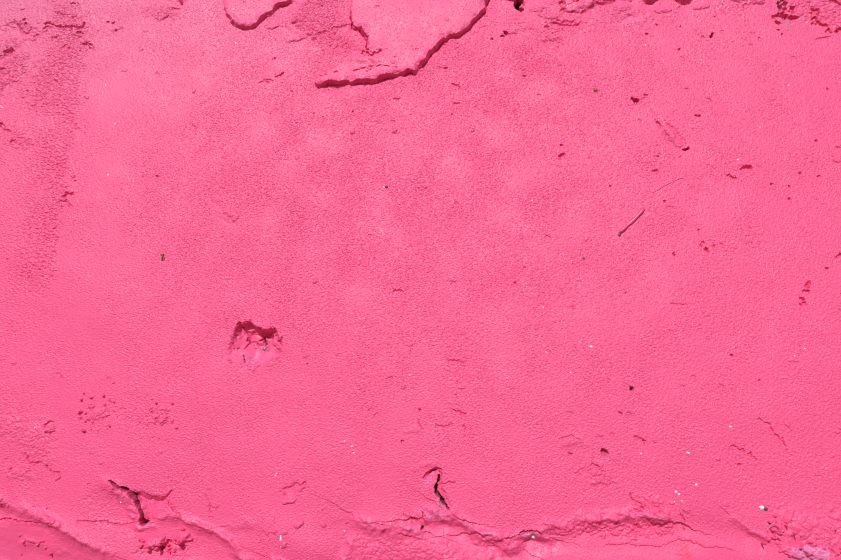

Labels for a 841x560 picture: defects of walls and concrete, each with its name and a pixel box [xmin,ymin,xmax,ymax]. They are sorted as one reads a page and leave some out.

peeling [223,0,490,90]
spalling [501,0,841,50]
crack [411,458,457,502]
spalling [575,448,617,493]
spalling [346,532,482,560]
crack [403,512,429,531]
peeling [514,526,553,542]
spalling [759,506,841,560]